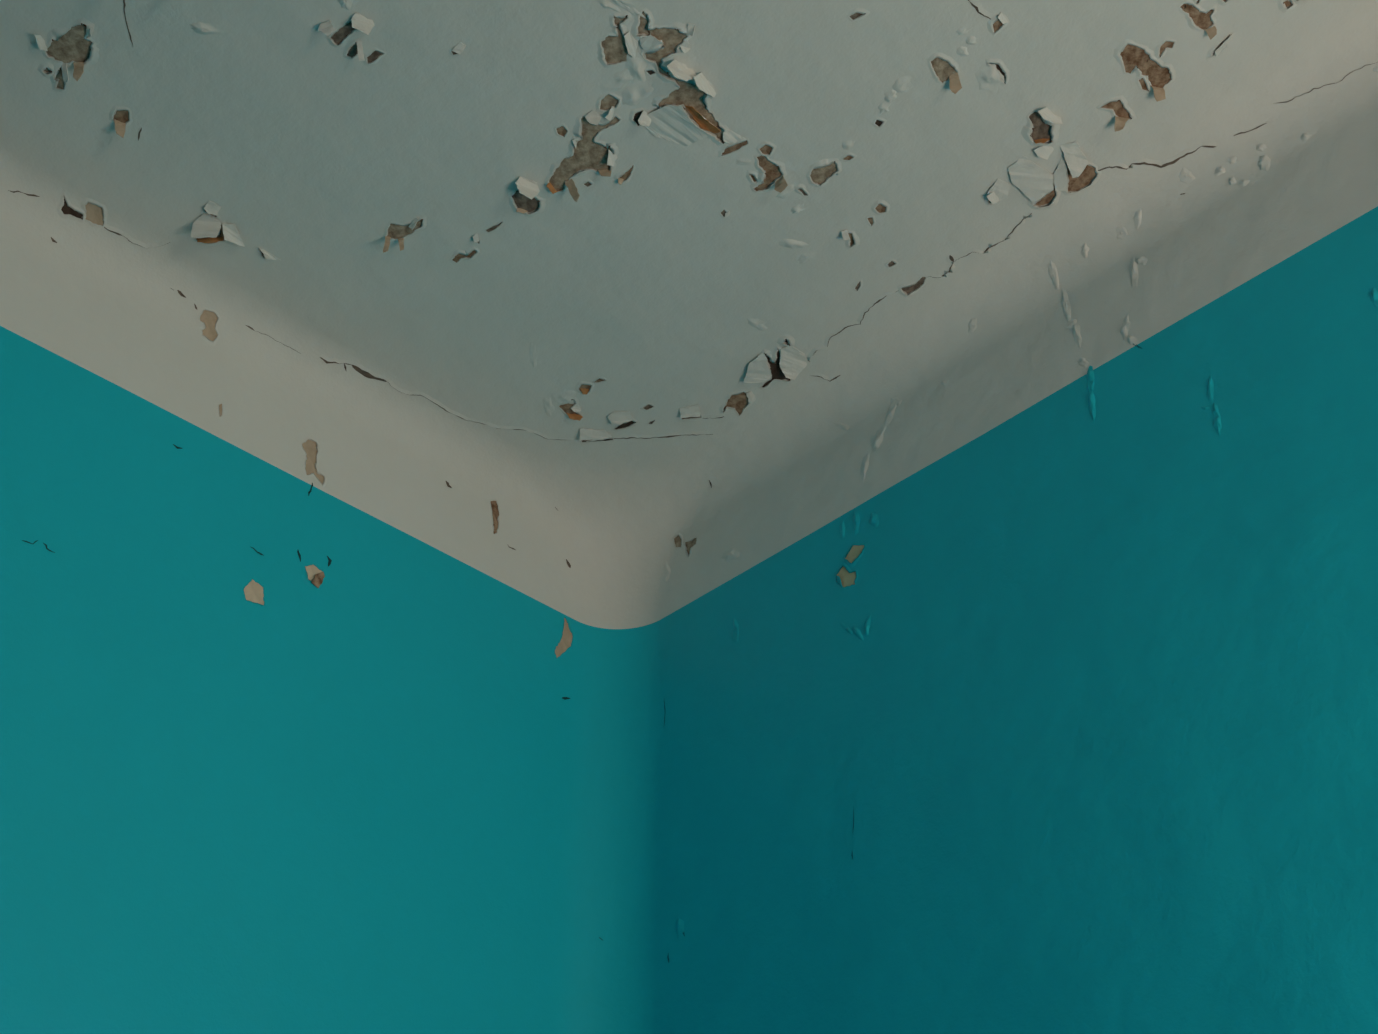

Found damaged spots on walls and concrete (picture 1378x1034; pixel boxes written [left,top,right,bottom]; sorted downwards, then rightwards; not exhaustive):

peeling [34,17,100,92]
peeling [318,13,387,66]
peeling [448,7,857,264]
peeling [984,107,1102,210]
peeling [1096,37,1177,132]
peeling [1177,0,1235,60]
crack [1098,62,1377,195]
peeling [191,201,281,261]
crack [806,213,1035,381]
crack [246,325,724,442]
peeling [679,334,806,420]
peeling [241,577,267,608]